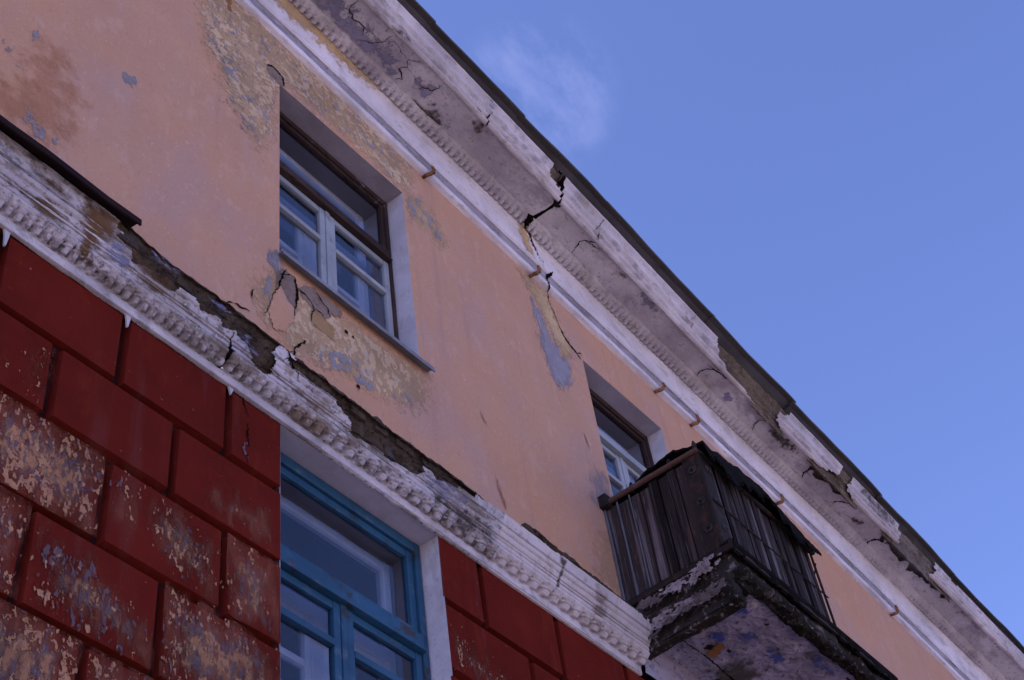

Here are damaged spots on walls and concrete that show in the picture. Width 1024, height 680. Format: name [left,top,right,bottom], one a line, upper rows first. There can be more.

crack [349,0,441,91]
peeling [195,0,445,247]
crack [522,170,581,359]
peeling [0,392,279,680]
crack [242,398,250,462]
crack [217,269,331,378]
peeling [116,223,484,500]
spalling [521,523,882,680]
spalling [717,344,787,436]
spalling [806,456,857,510]
spalling [880,529,950,603]